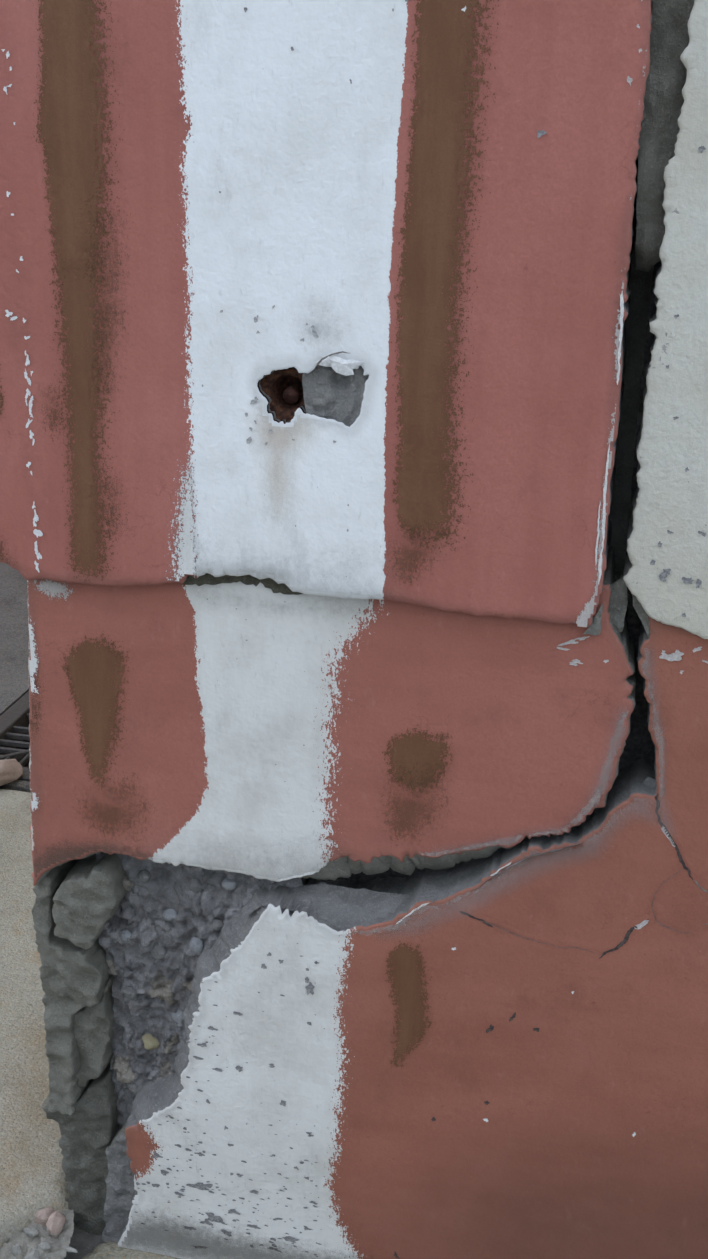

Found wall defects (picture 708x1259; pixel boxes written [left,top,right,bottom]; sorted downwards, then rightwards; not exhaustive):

spalling [245,351,369,445]
crack [244,0,708,959]
spalling [32,852,322,1257]